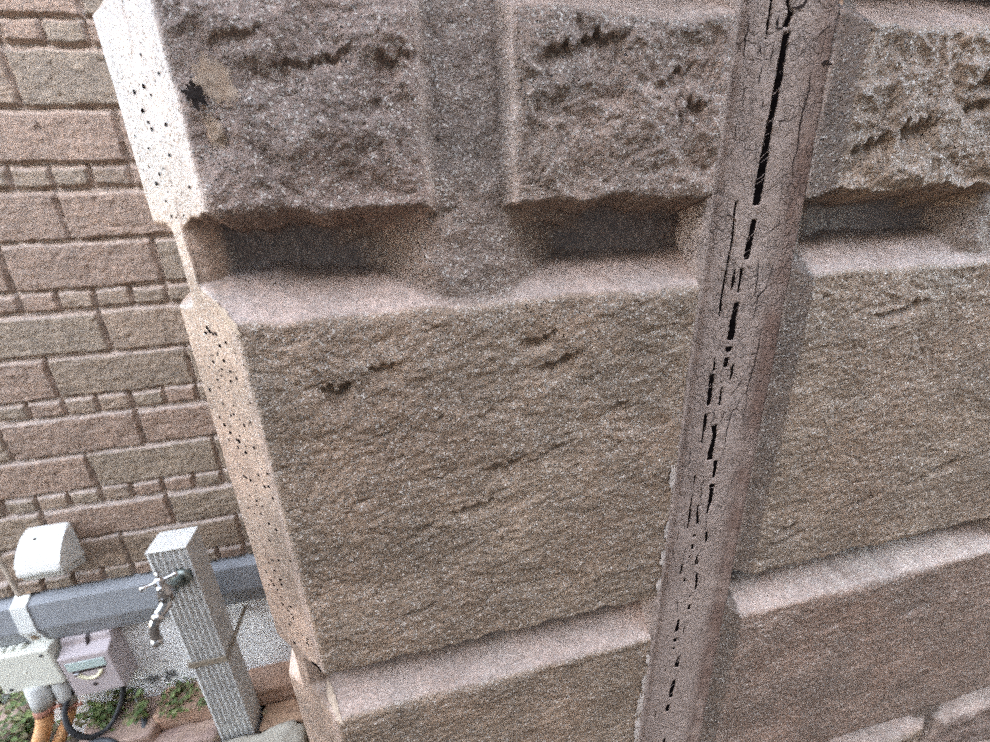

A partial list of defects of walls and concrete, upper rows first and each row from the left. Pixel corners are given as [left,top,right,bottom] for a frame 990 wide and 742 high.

crack [655,0,832,742]